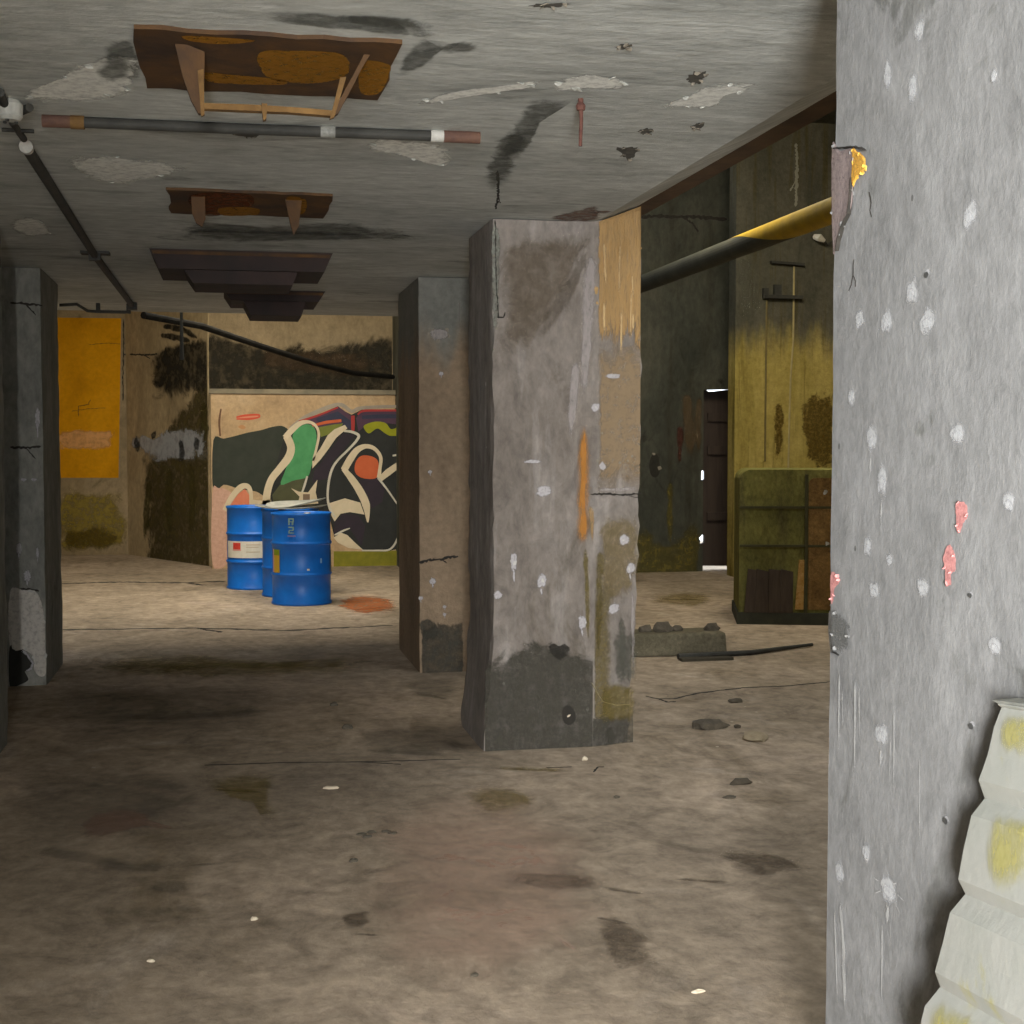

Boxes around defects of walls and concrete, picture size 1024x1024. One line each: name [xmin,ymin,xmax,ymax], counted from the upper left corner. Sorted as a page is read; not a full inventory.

peeling [25,57,137,101]
peeling [669,71,752,109]
crack [490,171,501,209]
flaking render [830,142,867,254]
water stain [774,404,784,455]
water stain [802,395,832,468]
water stain [132,386,209,566]
rust [579,432,594,538]
crack [591,488,642,498]
crack [419,555,458,564]
spalling [8,587,47,687]
water stain [485,641,633,751]